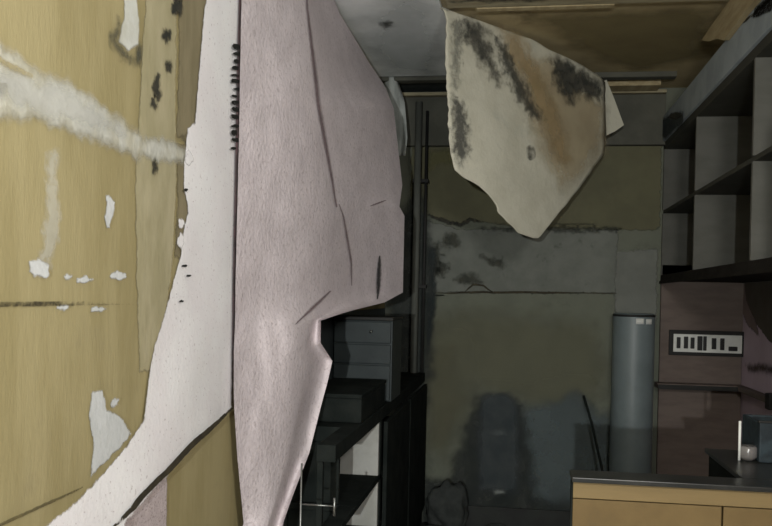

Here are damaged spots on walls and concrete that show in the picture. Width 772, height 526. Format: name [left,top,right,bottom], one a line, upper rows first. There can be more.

water stain [172,0,183,16]
water stain [151,61,172,109]
water stain [399,19,604,175]
peeling [177,219,185,249]
crack [0,300,74,308]
peeling [89,390,131,475]
water stain [452,395,610,509]